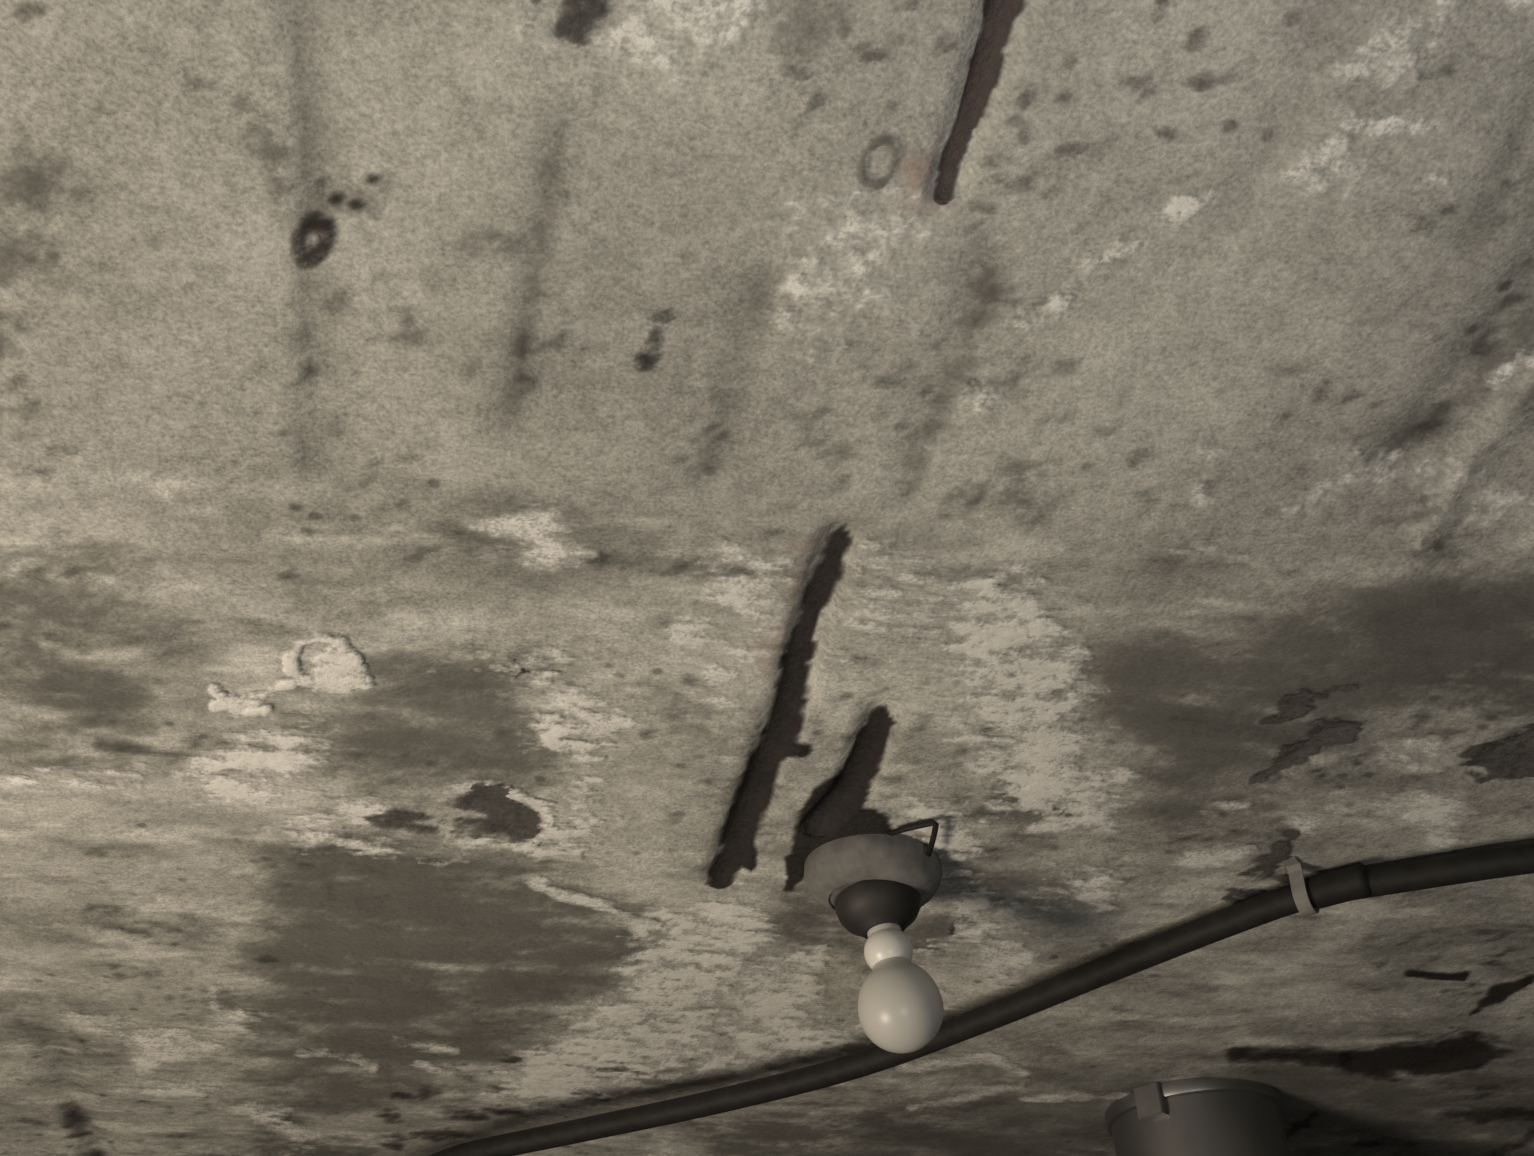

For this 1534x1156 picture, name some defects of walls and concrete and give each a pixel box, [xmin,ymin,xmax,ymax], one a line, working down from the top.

spalling [554,0,607,45]
leakage [1147,190,1217,229]
leakage [776,184,933,362]
leakage [1013,236,1142,332]
leakage [649,541,795,762]
leakage [0,763,143,791]
spalling [364,784,539,844]
crack [705,527,894,892]
leakage [825,539,1534,988]
spalling [1458,725,1534,784]
leakage [65,647,876,1156]
spalling [1226,975,1534,1079]